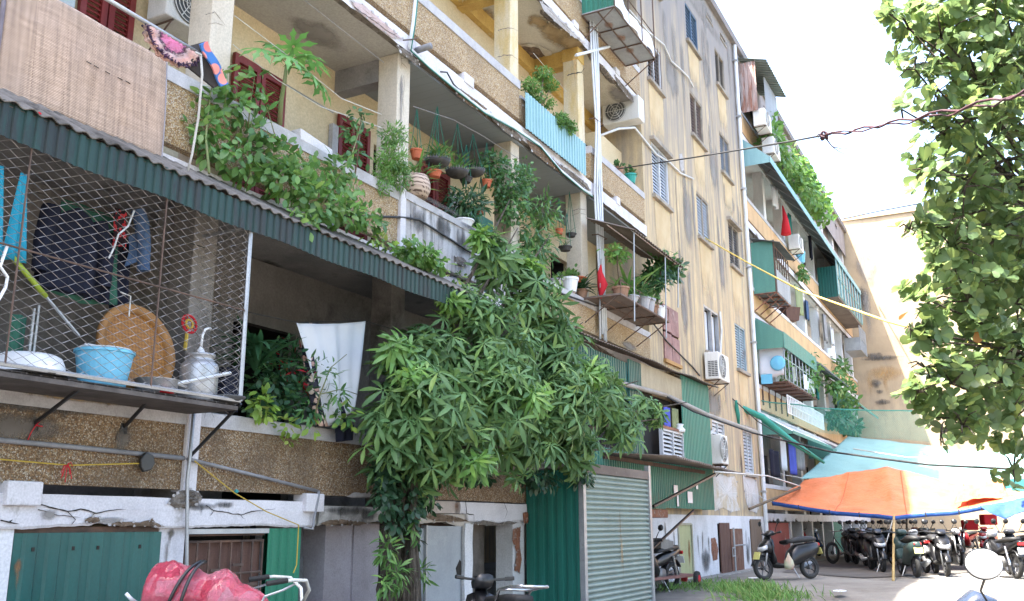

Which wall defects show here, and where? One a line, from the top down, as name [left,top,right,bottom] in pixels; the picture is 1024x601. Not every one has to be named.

water stain [528,16,583,49]
spalling [168,488,202,510]
crack [0,504,121,525]
spalling [84,515,164,528]
crack [209,507,273,518]
peeling [426,512,529,573]